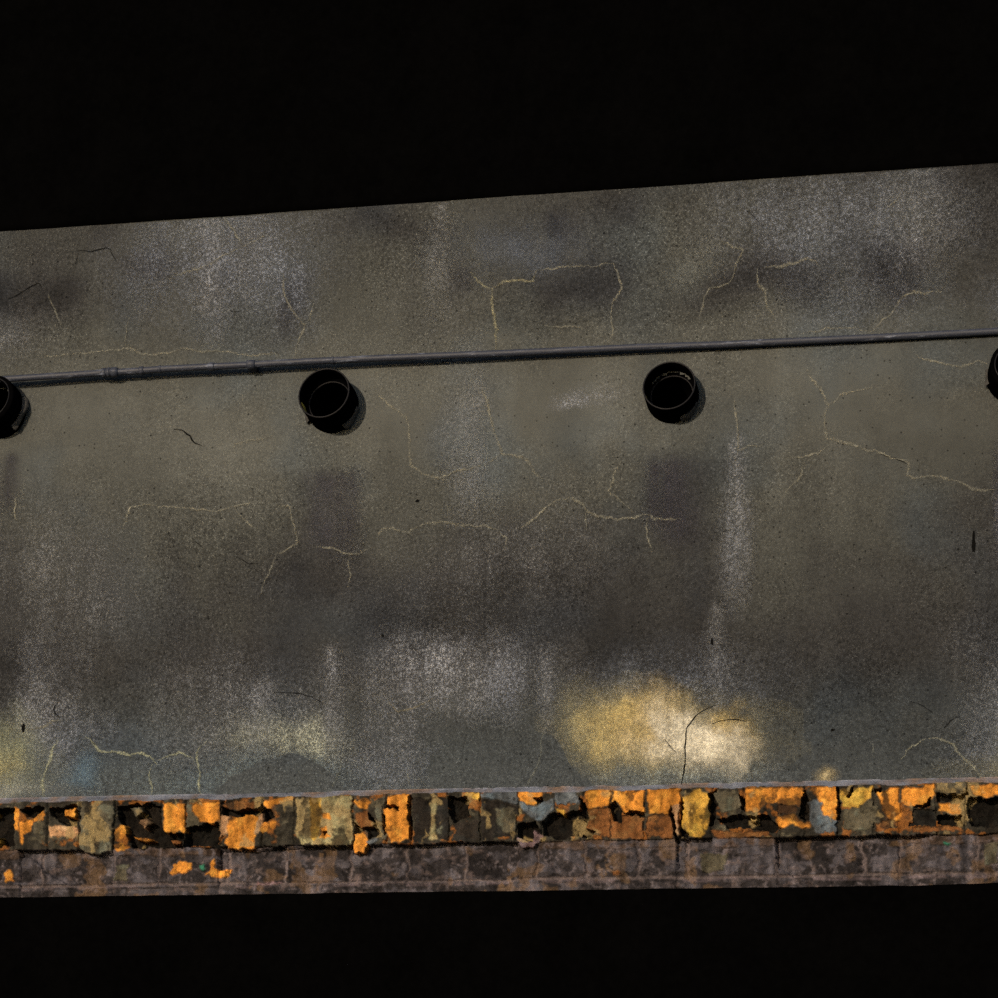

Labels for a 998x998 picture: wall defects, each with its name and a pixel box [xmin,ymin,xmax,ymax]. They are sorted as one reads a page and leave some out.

crack [474,266,622,342]
crack [788,426,978,490]
crack [575,471,668,544]
water stain [578,691,746,784]
spalling [0,782,998,879]